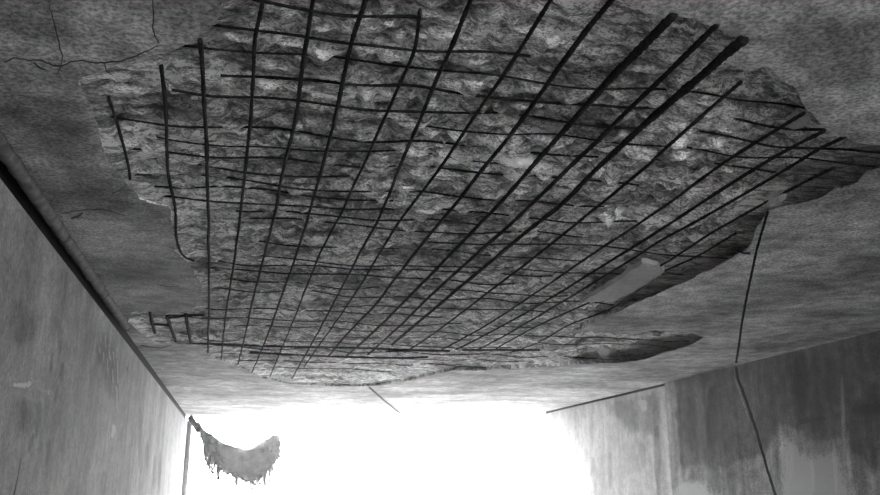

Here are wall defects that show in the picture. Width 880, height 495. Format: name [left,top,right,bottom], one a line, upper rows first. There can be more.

crack [4,0,159,76]
spalling [78,0,880,387]
crack [734,211,777,495]